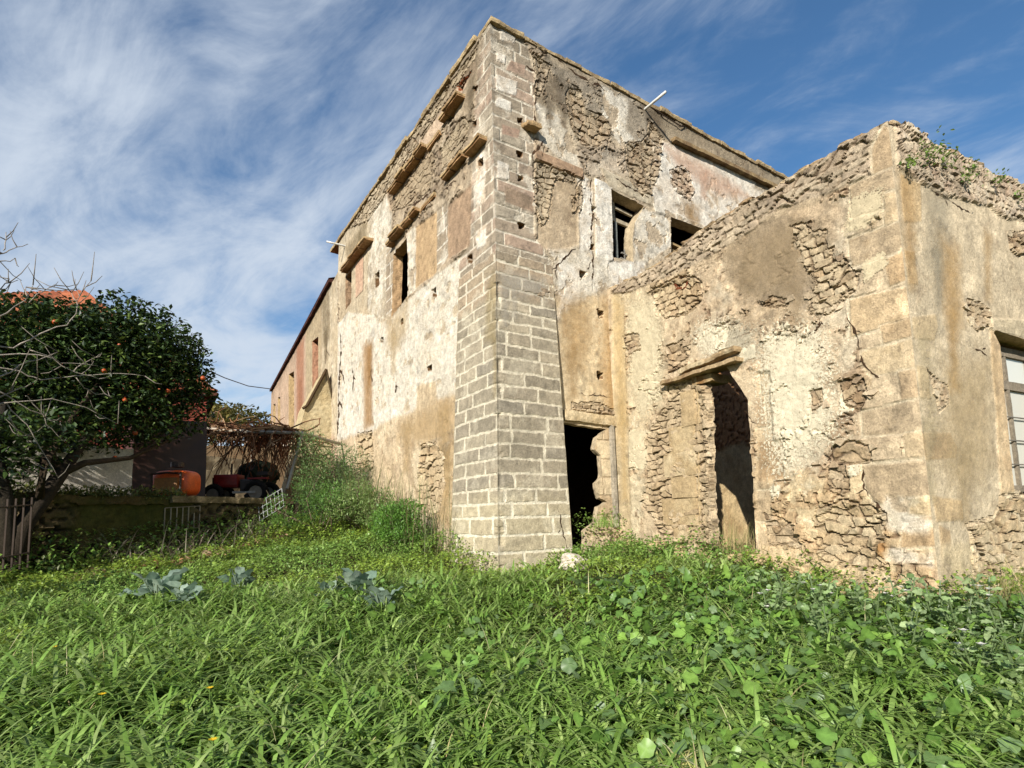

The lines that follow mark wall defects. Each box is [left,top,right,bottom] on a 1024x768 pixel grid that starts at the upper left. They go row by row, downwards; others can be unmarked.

flaking render [531,54,556,97]
flaking render [349,44,479,229]
flaking render [516,150,594,227]
flaking render [565,89,614,148]
flaking render [624,120,695,202]
peeling [844,185,888,237]
peeling [622,223,890,570]
crack [805,318,879,408]
flaking render [417,442,446,520]
flaking render [964,489,1024,598]